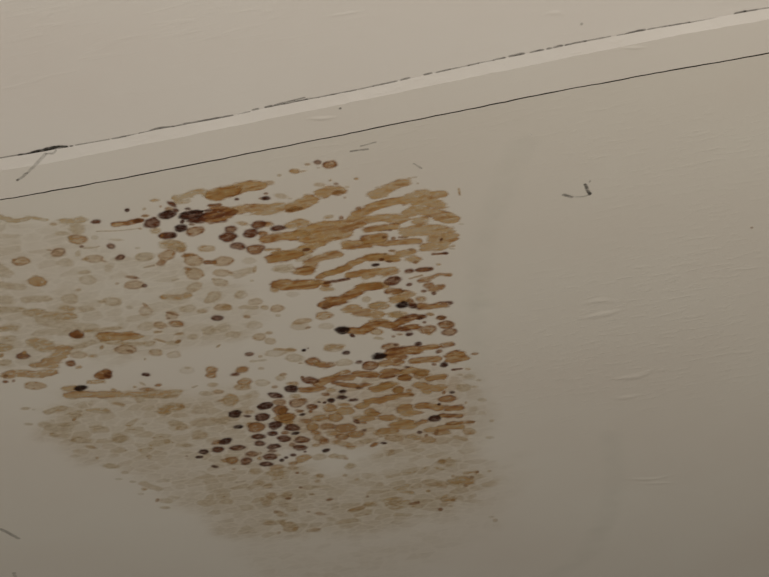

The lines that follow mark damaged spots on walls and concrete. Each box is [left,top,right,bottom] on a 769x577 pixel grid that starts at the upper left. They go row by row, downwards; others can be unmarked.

damp [28,277,47,286]
damp [111,179,477,474]
damp [0,330,143,389]
damp [62,369,183,414]